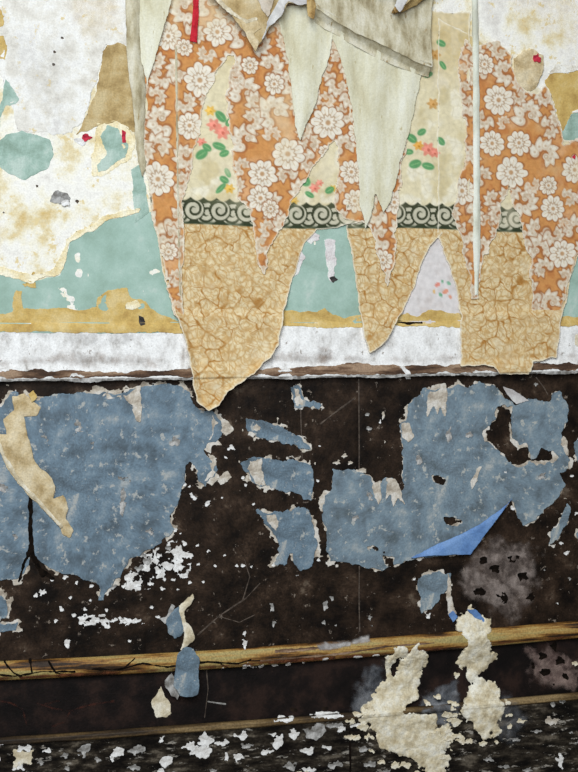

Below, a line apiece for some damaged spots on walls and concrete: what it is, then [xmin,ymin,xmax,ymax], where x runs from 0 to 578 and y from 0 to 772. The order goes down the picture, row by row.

peeling [0,0,135,146]
peeling [395,238,462,328]
peeling [283,308,363,328]
peeling [0,362,578,635]
damp [465,540,535,609]
peeling [150,594,200,700]
damp [526,642,578,686]
peeling [12,745,51,771]
peeling [60,744,146,771]
peeling [157,756,175,772]
peeling [181,711,361,762]
peeling [284,761,316,772]